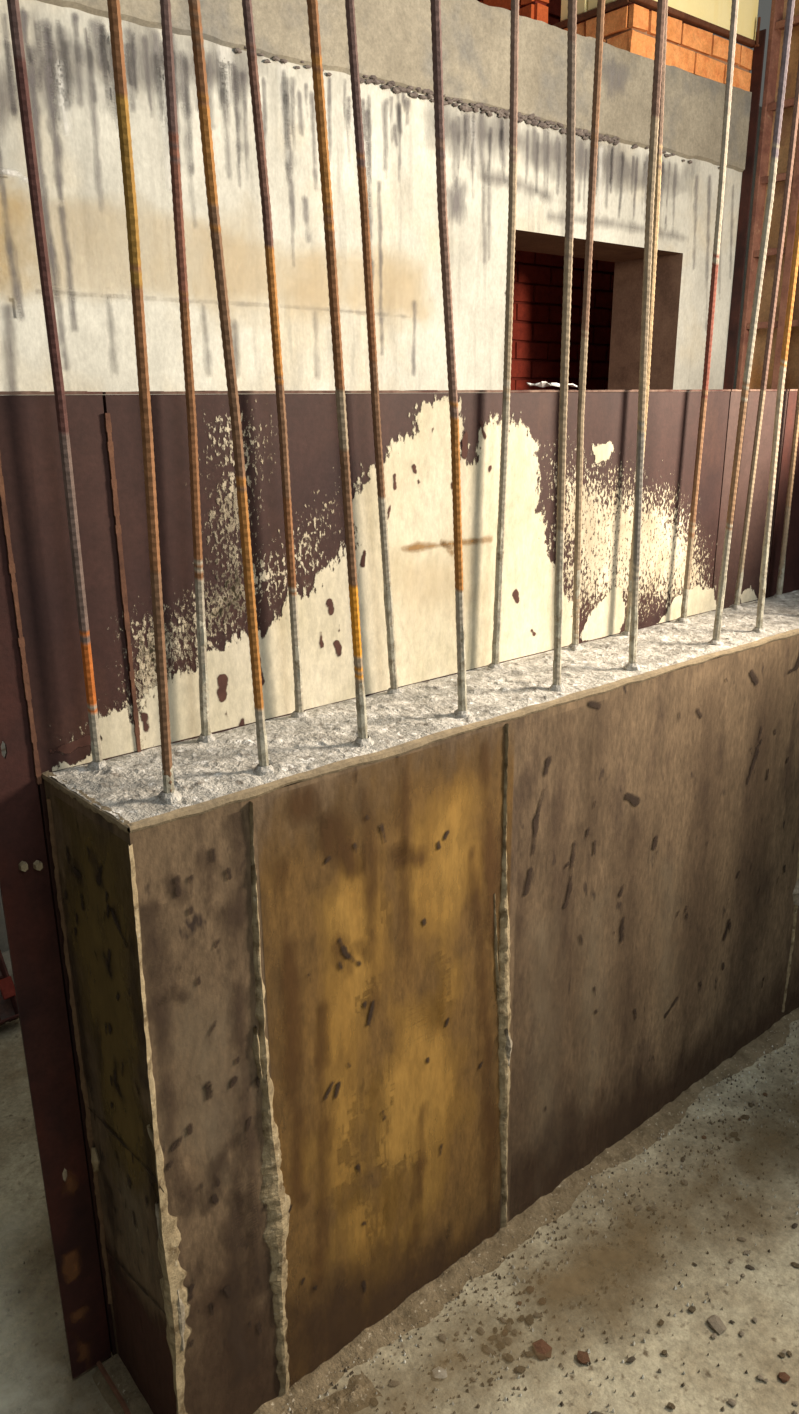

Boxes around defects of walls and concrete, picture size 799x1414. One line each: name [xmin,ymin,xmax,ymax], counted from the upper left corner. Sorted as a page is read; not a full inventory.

damp [0,10,247,320]
damp [279,61,331,217]
damp [347,92,409,150]
damp [451,188,461,216]
damp [444,114,675,200]
damp [6,242,22,391]
rust [407,539,485,554]
damp [512,990,799,1214]
damp [197,1092,501,1414]
damp [422,1097,799,1388]